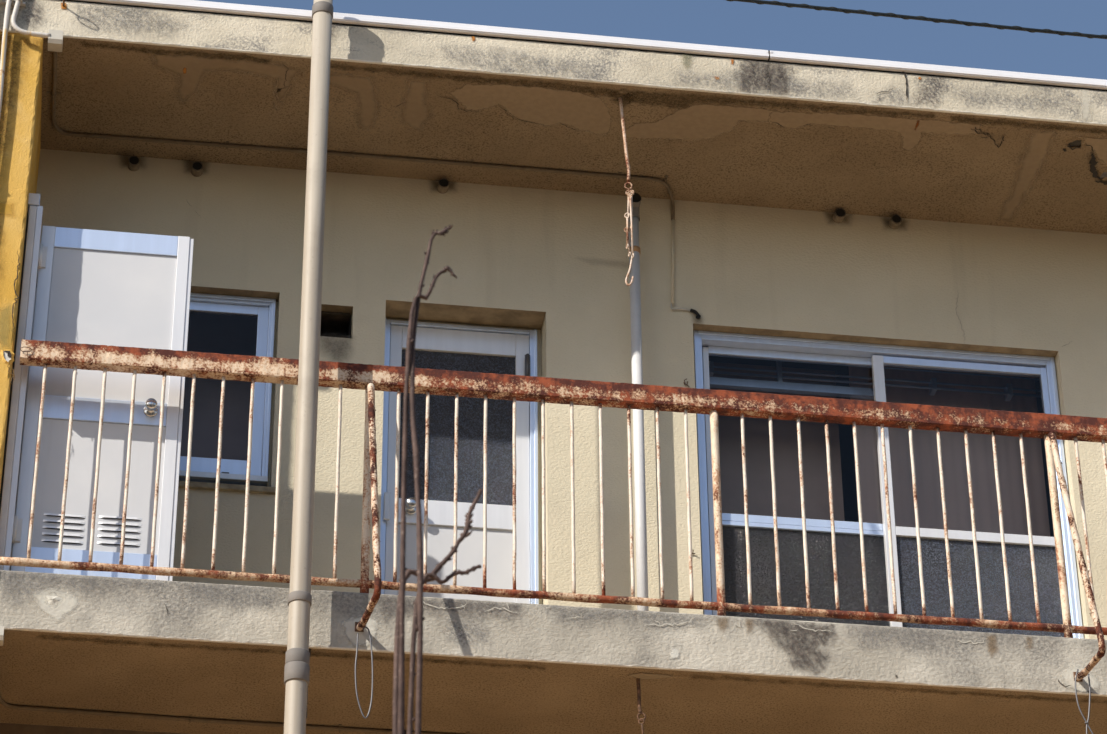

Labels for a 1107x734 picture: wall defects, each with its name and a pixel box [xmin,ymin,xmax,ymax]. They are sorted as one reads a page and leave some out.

damp [84,43,268,63]
damp [331,50,940,118]
peeling [450,84,612,135]
peeling [625,104,981,151]
damp [953,117,1106,134]
peeling [1063,136,1107,185]
damp [757,620,834,669]